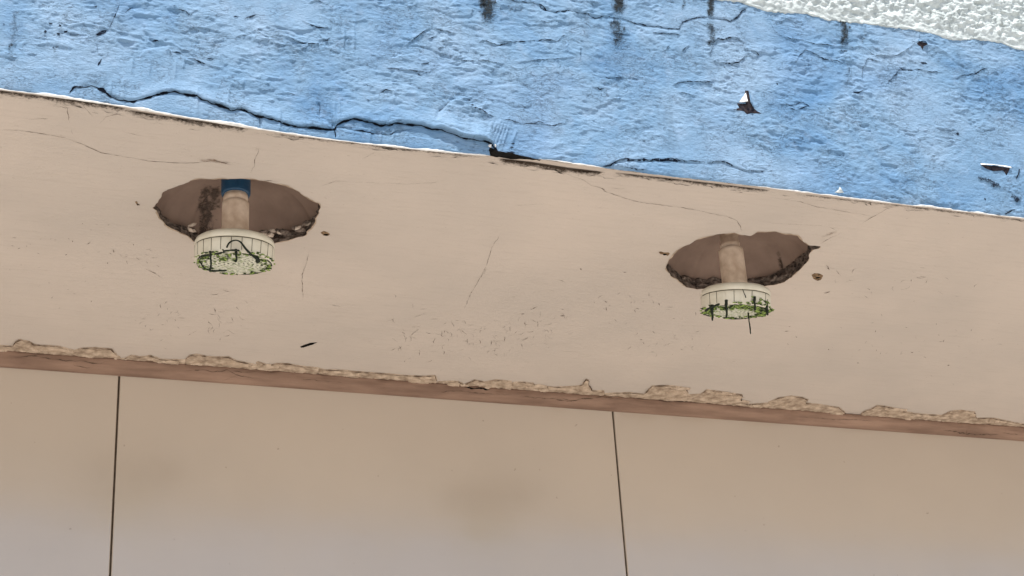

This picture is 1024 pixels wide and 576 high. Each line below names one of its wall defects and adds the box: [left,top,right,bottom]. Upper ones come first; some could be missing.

damp [479,0,497,28]
damp [610,0,626,55]
damp [707,0,715,46]
crack [15,0,763,227]
peeling [734,91,761,114]
peeling [980,163,1011,175]
spalling [153,178,224,242]
spalling [240,178,330,244]
spalling [659,231,823,289]
spalling [0,339,846,415]
spalling [860,405,1024,427]